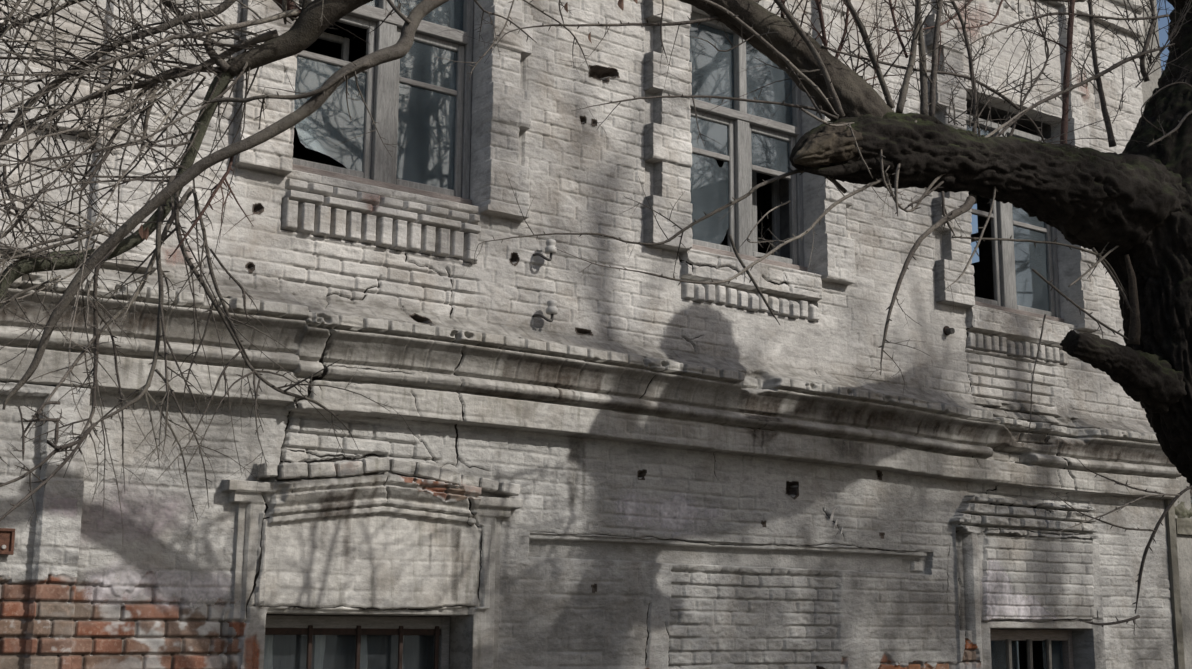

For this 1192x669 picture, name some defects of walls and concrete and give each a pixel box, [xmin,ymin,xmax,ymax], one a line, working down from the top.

crack [279,283,489,502]
peeling [395,474,467,503]
crack [246,495,482,618]
peeling [0,571,250,669]
peeling [877,638,981,669]